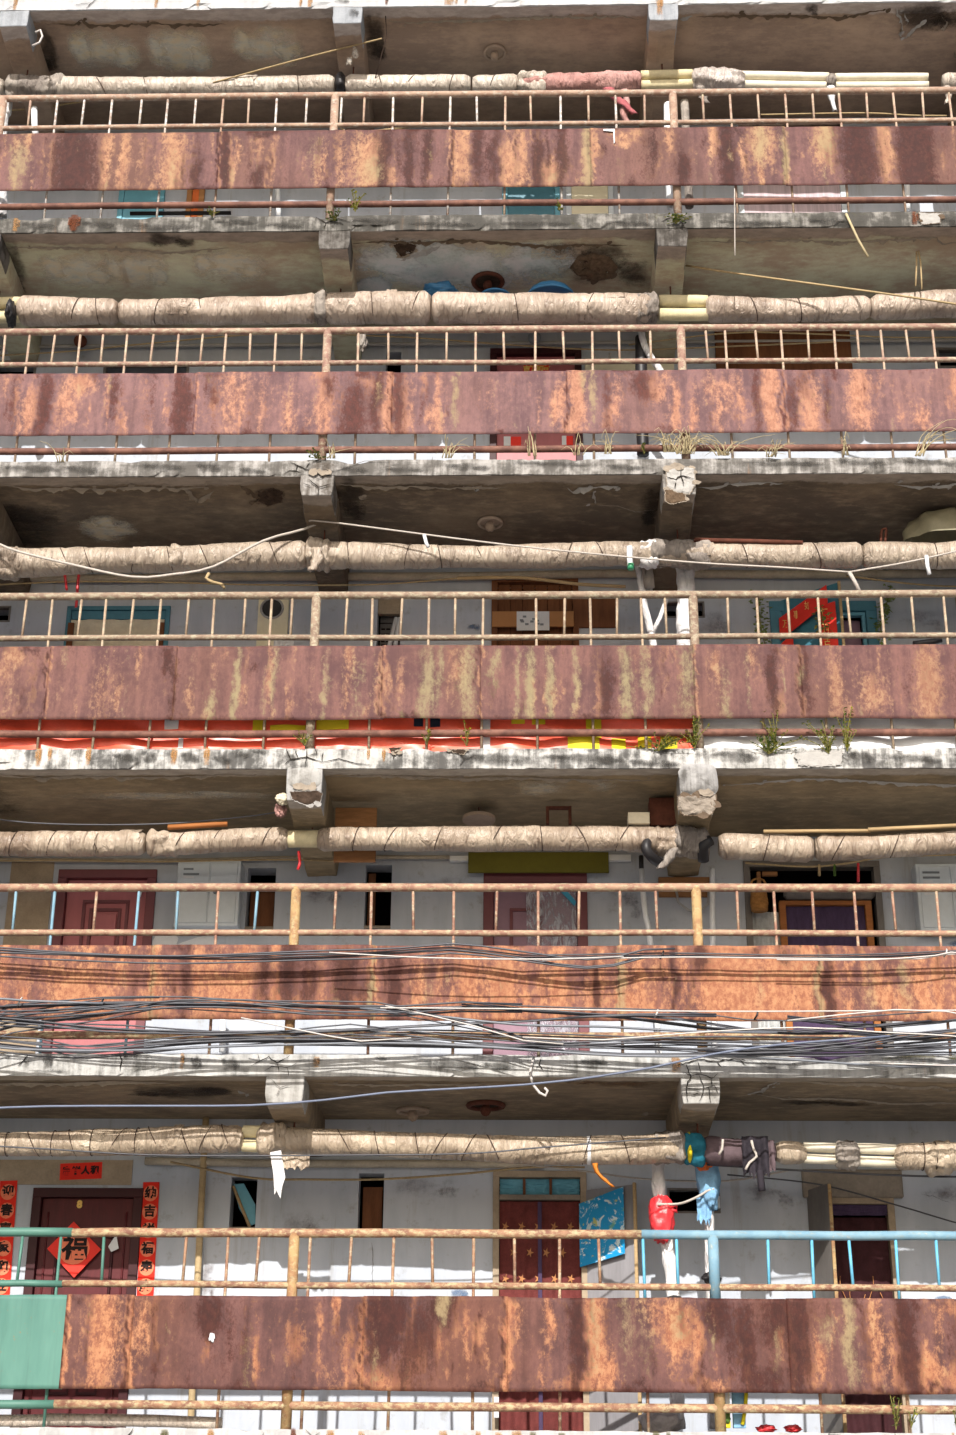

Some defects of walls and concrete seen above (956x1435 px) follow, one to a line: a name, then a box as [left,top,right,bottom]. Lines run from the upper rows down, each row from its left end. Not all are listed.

spalling [663,462,782,504]
crack [681,1059,752,1102]